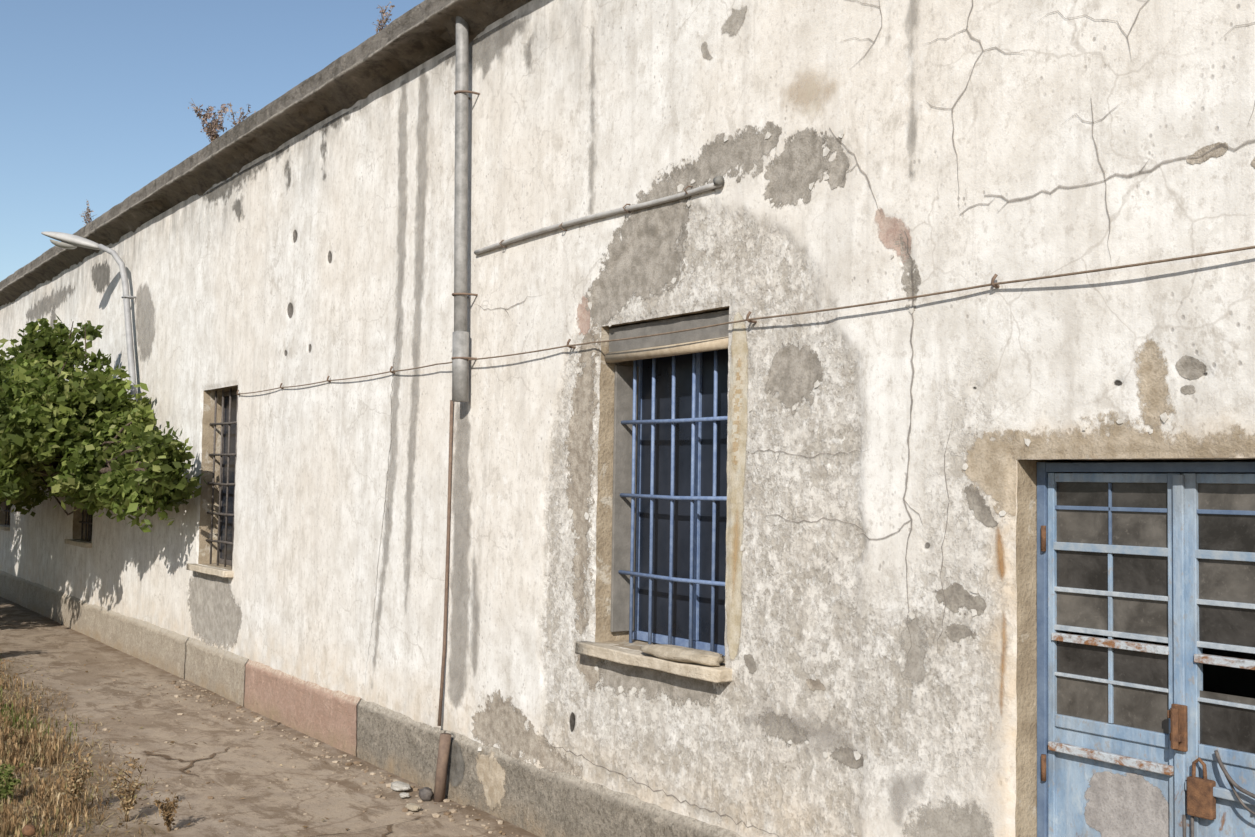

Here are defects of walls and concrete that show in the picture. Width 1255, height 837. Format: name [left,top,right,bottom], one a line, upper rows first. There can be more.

crack [829,127,878,208]
crack [925,0,1255,258]
spalling [564,121,849,635]
crack [766,231,953,674]
spalling [962,339,1255,527]
spalling [576,654,724,711]
spalling [744,654,757,674]
spalling [901,610,927,684]
spalling [935,582,986,646]
spalling [472,689,583,811]
spalling [902,796,994,837]
peeling [1084,771,1169,837]